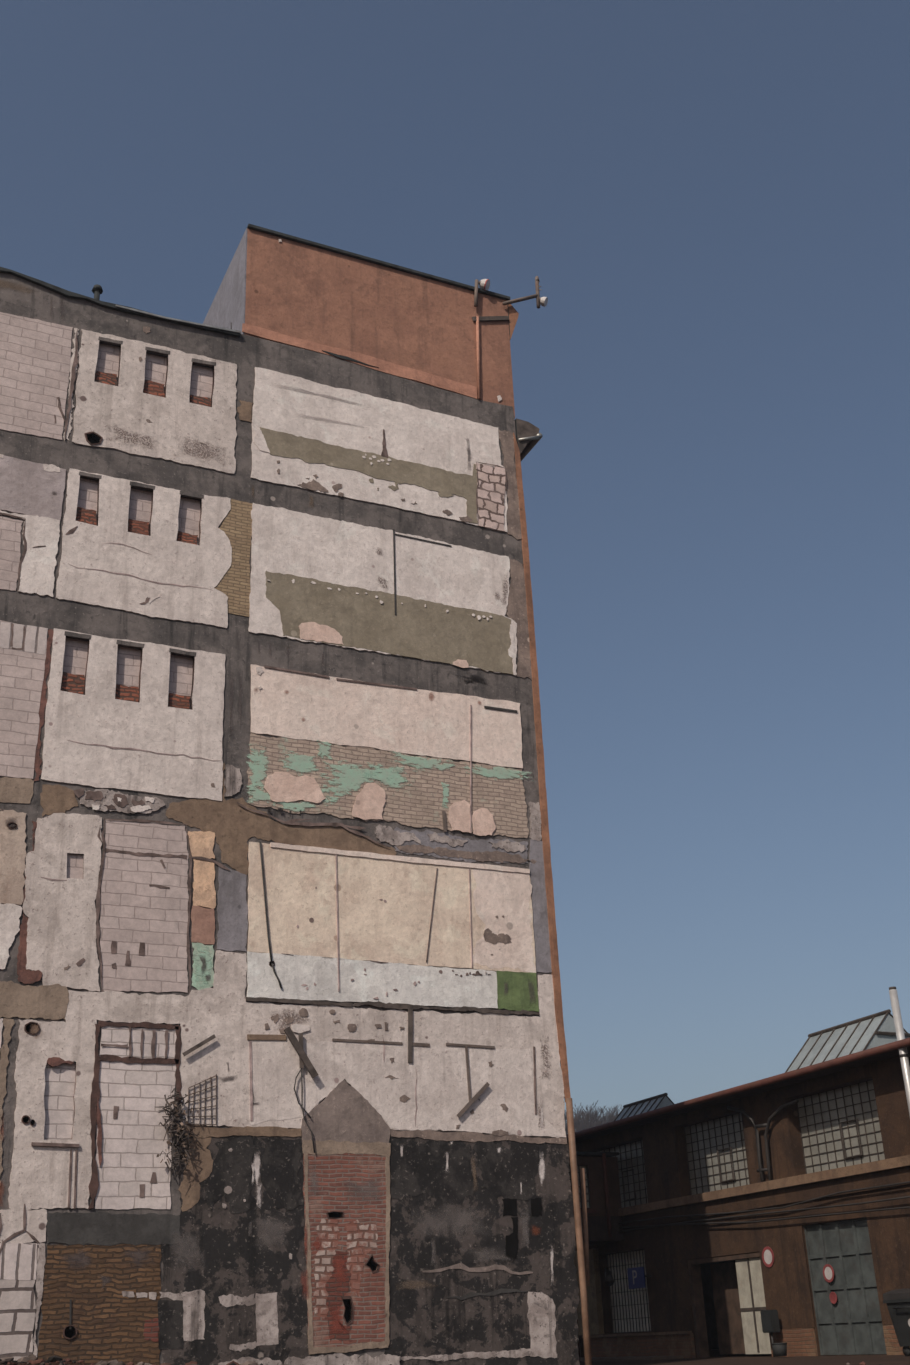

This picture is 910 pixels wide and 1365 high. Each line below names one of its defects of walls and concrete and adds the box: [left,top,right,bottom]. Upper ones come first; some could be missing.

crack [58,329,78,440]
peeling [299,622,344,645]
peeling [453,659,469,668]
peeling [508,624,517,675]
peeling [211,740,529,812]
peeling [375,824,537,864]
damp [251,1156,261,1204]
spalling [364,1254,380,1273]
spalling [341,1296,354,1326]